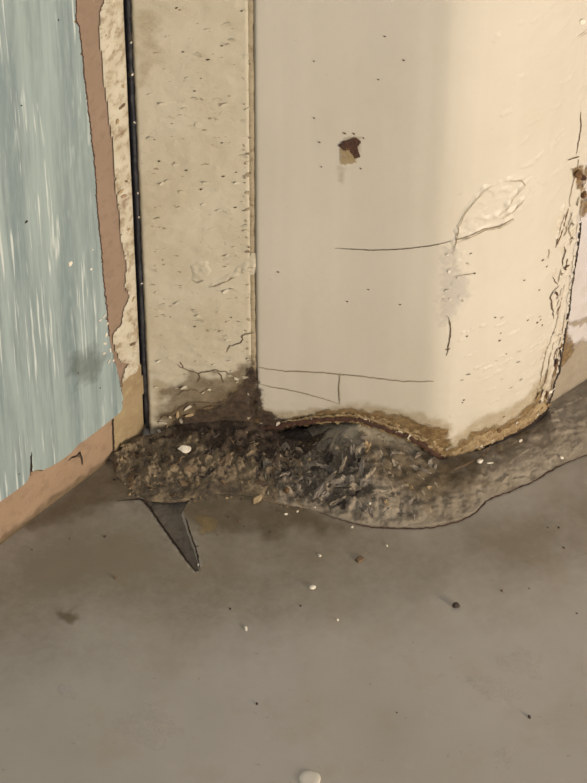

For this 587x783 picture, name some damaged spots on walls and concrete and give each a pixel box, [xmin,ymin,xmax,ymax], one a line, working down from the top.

spalling [74,0,115,364]
crack [335,219,514,251]
crack [549,115,587,404]
crack [175,362,237,396]
crack [259,367,434,405]
water stain [2,363,477,542]
flaking render [312,422,438,518]
spalling [454,445,494,470]